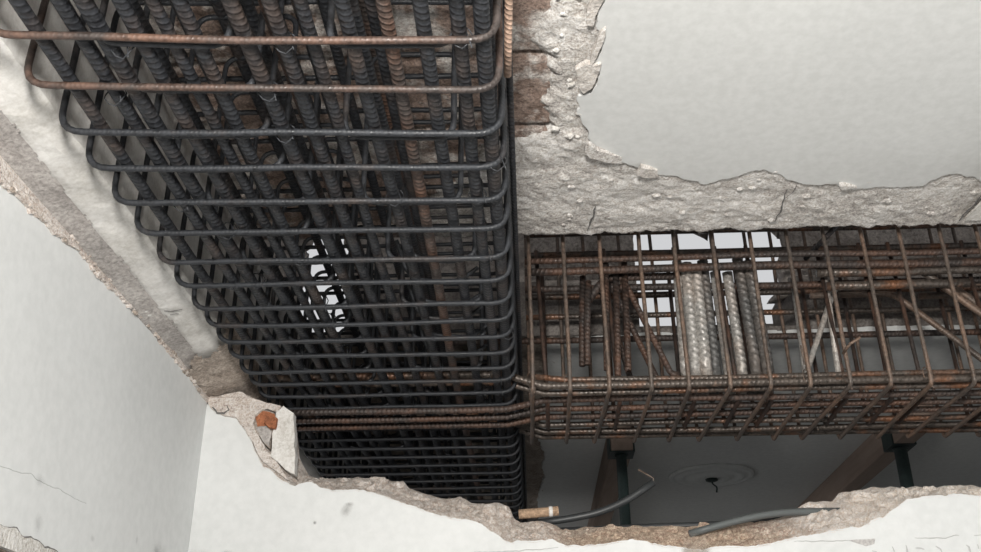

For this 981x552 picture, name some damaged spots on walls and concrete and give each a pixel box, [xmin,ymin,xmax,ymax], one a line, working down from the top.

flaking render [391,5,417,36]
flaking render [163,48,282,240]
flaking render [191,6,320,240]
flaking render [283,5,399,238]
flaking render [400,5,492,238]
spalling [512,0,981,236]
spalling [0,524,58,552]
spalling [0,110,293,481]
spalling [314,343,382,404]
spalling [362,430,467,499]
spalling [454,345,502,371]
spalling [469,336,554,519]